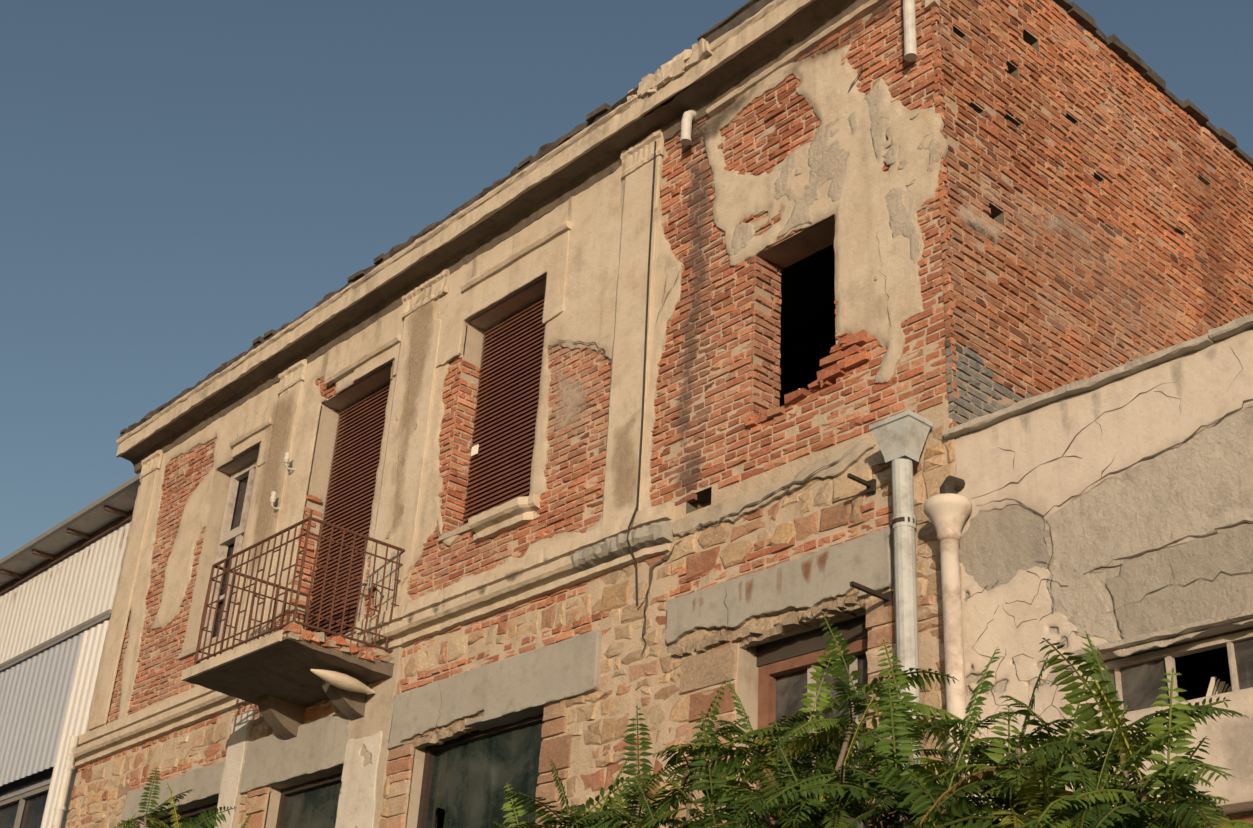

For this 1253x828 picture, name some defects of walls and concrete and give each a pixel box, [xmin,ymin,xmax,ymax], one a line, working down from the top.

spalling [621,38,716,120]
spalling [650,0,966,514]
spalling [966,202,1005,237]
spalling [106,438,217,724]
spalling [407,334,612,600]
flaking render [959,407,1253,657]
crack [965,346,1253,747]